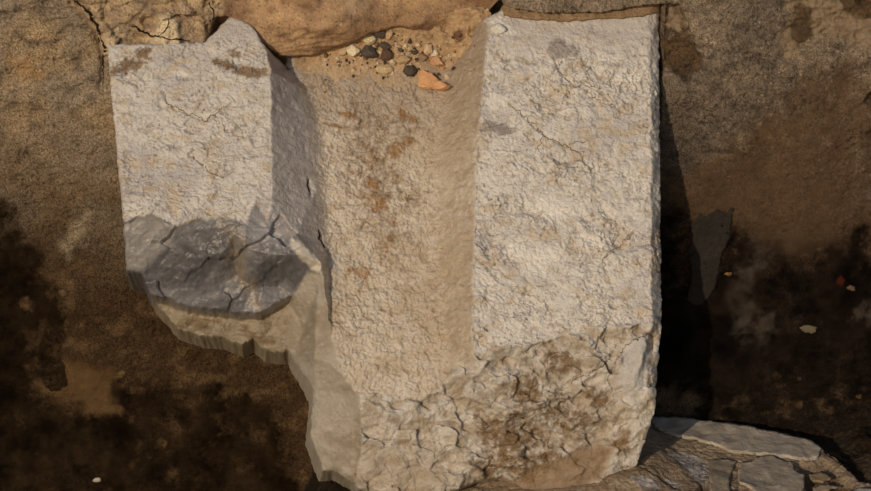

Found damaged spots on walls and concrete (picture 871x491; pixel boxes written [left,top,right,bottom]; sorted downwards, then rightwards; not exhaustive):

crack [74,1,107,84]
crack [131,18,189,41]
damp [0,200,297,491]
spalling [123,201,325,318]
damp [656,210,871,426]